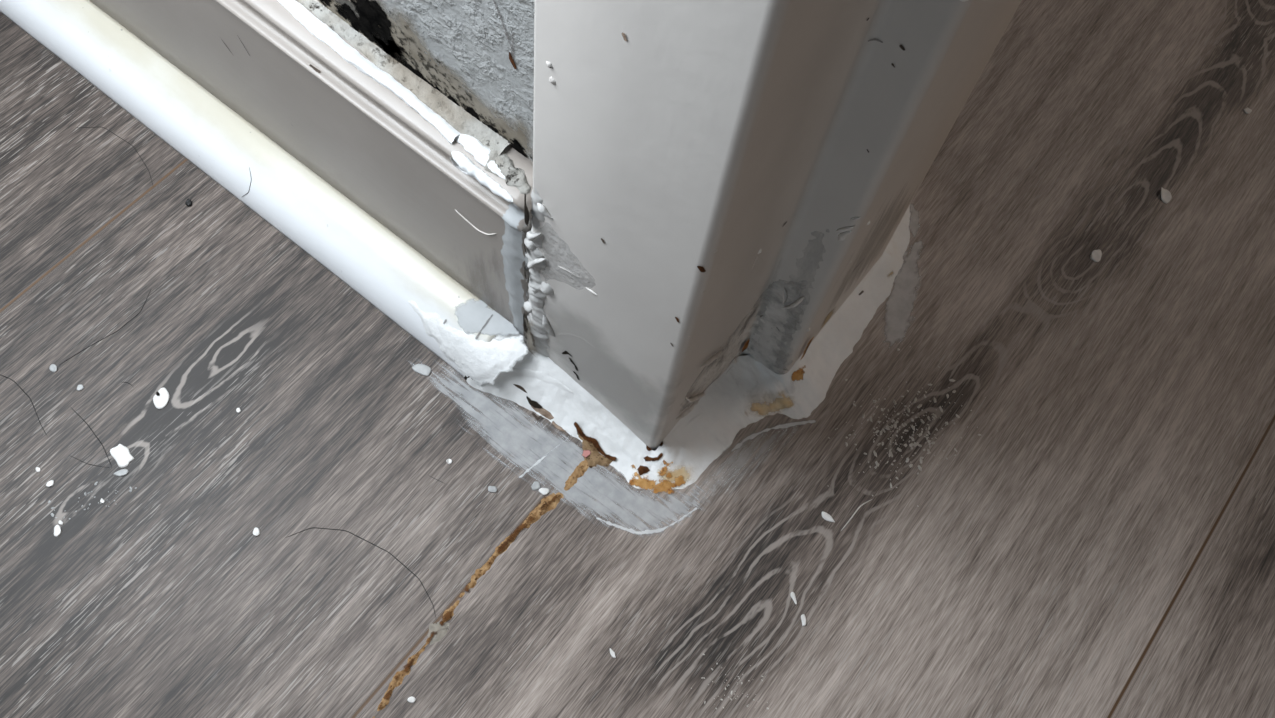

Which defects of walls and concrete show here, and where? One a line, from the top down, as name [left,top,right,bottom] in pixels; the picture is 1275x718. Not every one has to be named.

water stain [317,0,532,159]
rust [791,337,814,381]
spalling [526,396,616,469]
peeling [531,481,549,495]
rust [629,441,689,494]